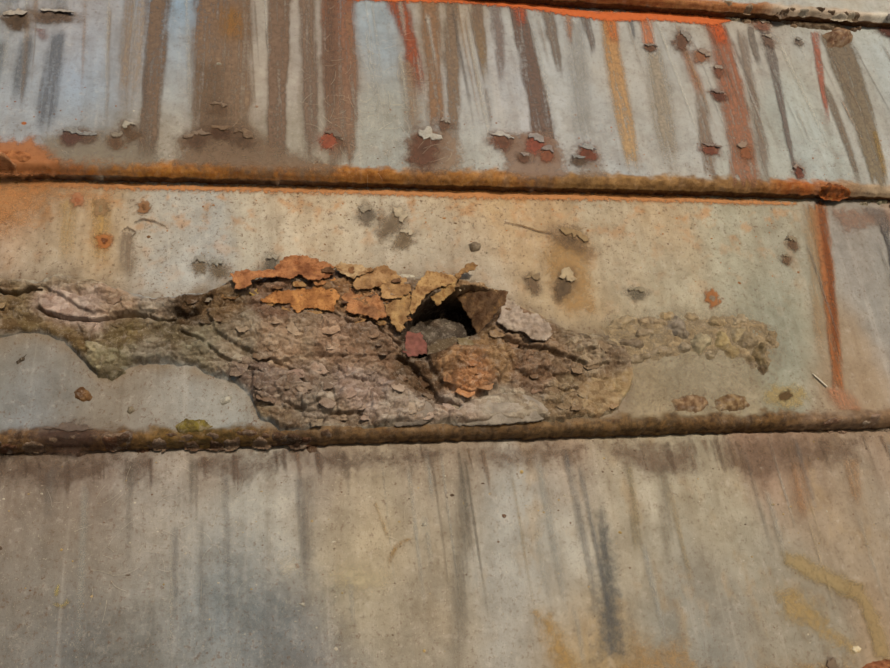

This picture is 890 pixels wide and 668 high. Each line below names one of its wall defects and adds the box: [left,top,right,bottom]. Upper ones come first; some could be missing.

leakage [14,29,63,120]
rust [0,0,861,269]
peeling [409,117,453,170]
peeling [490,131,514,151]
peeling [518,133,554,163]
peeling [570,143,597,166]
rust [812,28,886,186]
spalling [0,254,633,431]
rust [808,199,890,409]
peeling [36,422,101,453]